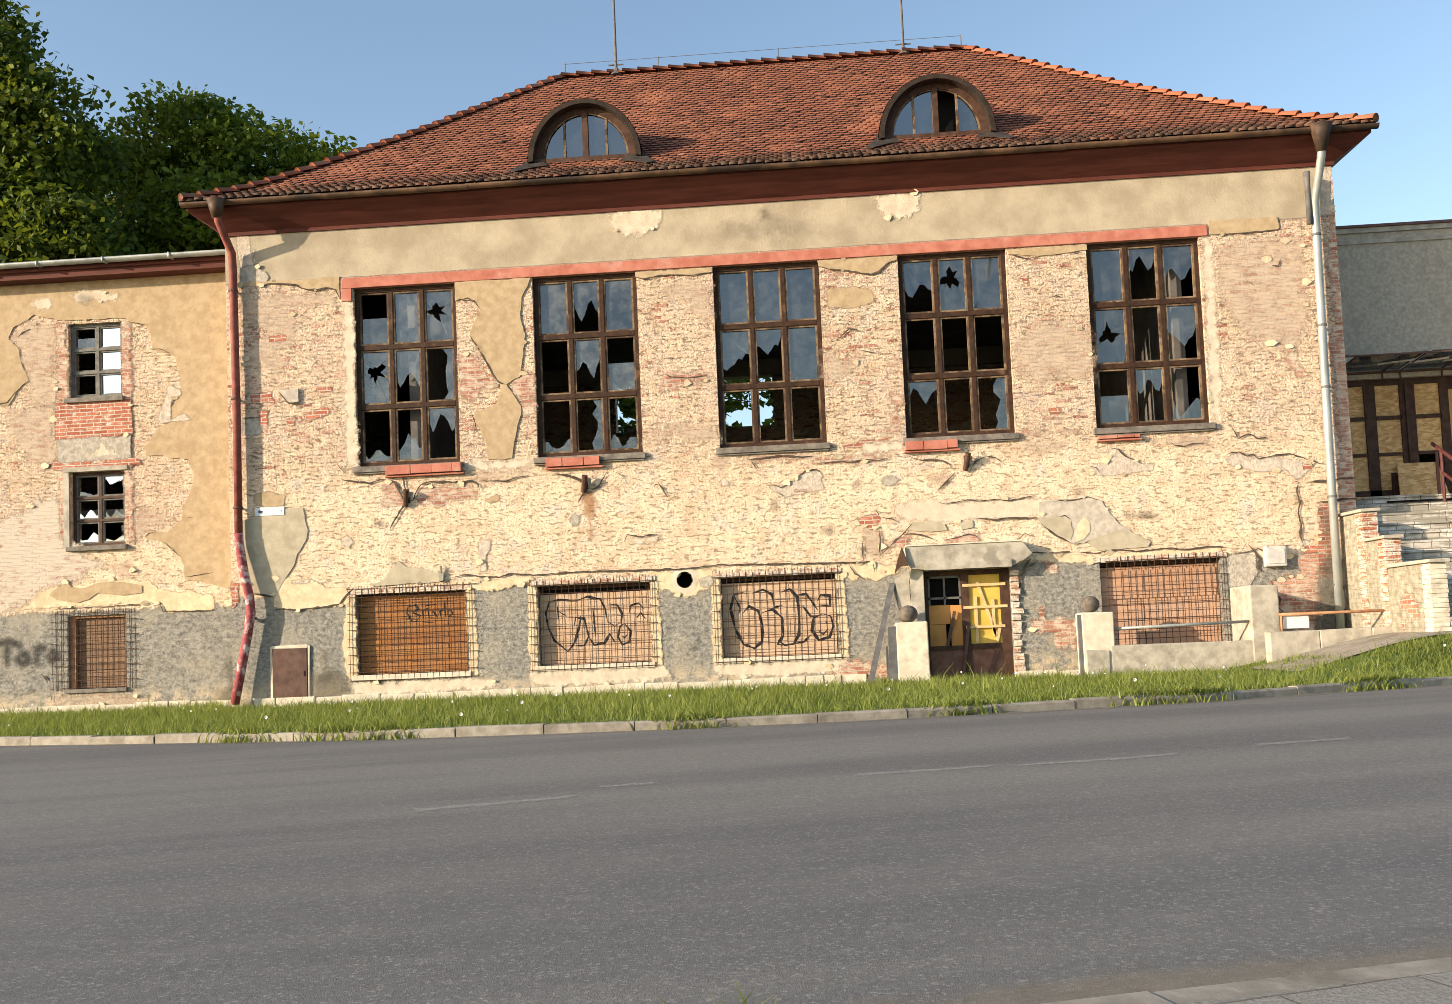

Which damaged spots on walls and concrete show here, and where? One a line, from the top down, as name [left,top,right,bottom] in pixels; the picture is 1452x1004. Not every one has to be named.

peeling [635,268,712,278]
peeling [817,256,897,308]
crack [819,260,895,309]
crack [460,297,504,384]
crack [834,328,879,353]
flaking render [1016,322,1093,384]
peeling [0,264,350,616]
crack [337,464,668,529]
spalling [747,393,905,498]
crack [444,418,1369,612]
spalling [1226,453,1315,480]
peeling [836,471,1332,631]